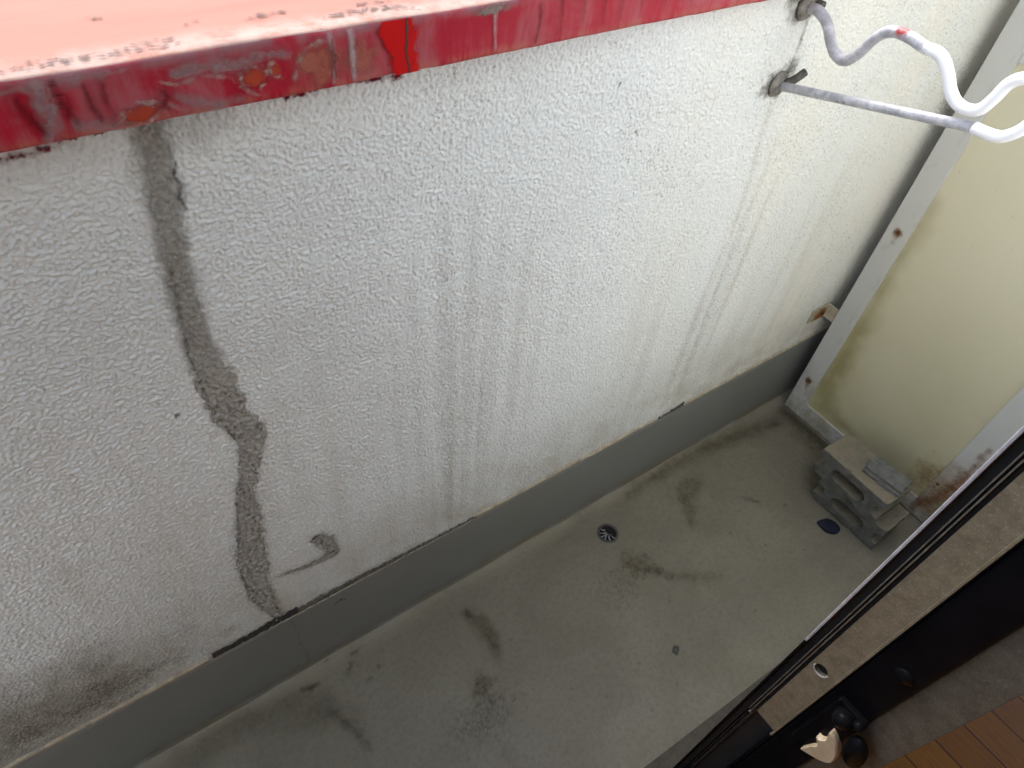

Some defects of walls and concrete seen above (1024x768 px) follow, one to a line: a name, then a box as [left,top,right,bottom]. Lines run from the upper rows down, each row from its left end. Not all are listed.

peeling [478,2,509,30]
peeling [113,99,178,128]
crack [137,121,282,622]